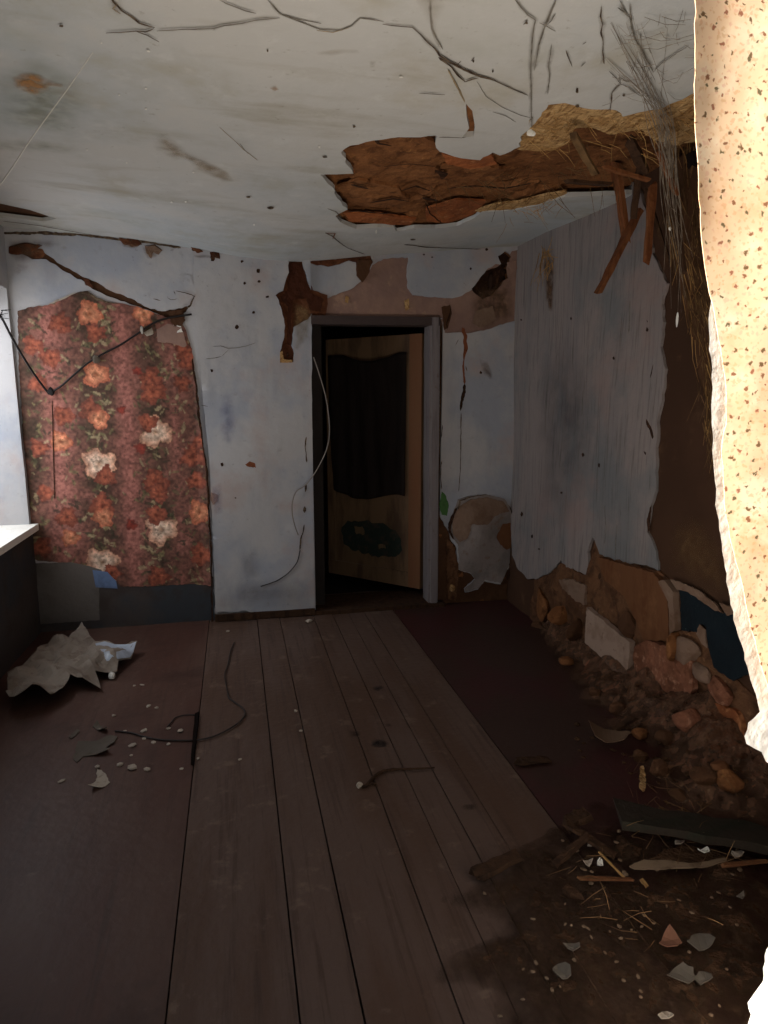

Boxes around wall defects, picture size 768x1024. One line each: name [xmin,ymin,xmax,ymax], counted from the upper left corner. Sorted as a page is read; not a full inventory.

crack [110,0,689,127]
flaking render [9,243,40,255]
flaking render [119,237,162,258]
spalling [266,81,696,363]
spalling [438,492,508,603]
peeling [670,579,749,681]